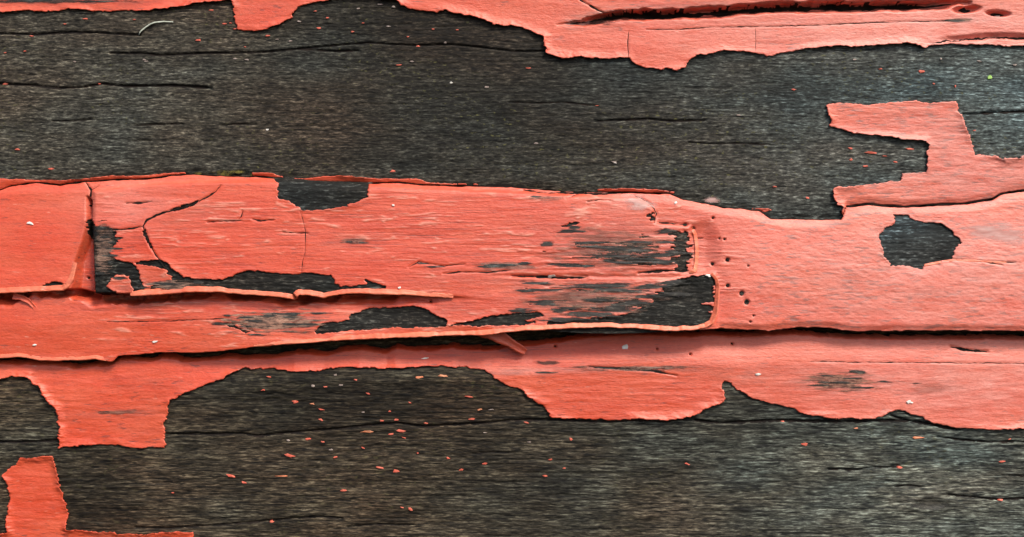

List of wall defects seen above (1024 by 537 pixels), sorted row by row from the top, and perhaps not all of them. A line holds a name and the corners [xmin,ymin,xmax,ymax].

crack [0,82,210,90]
crack [0,31,545,56]
crack [1,173,306,270]
peeling [0,0,1024,354]
crack [372,182,682,225]
peeling [0,365,1024,537]